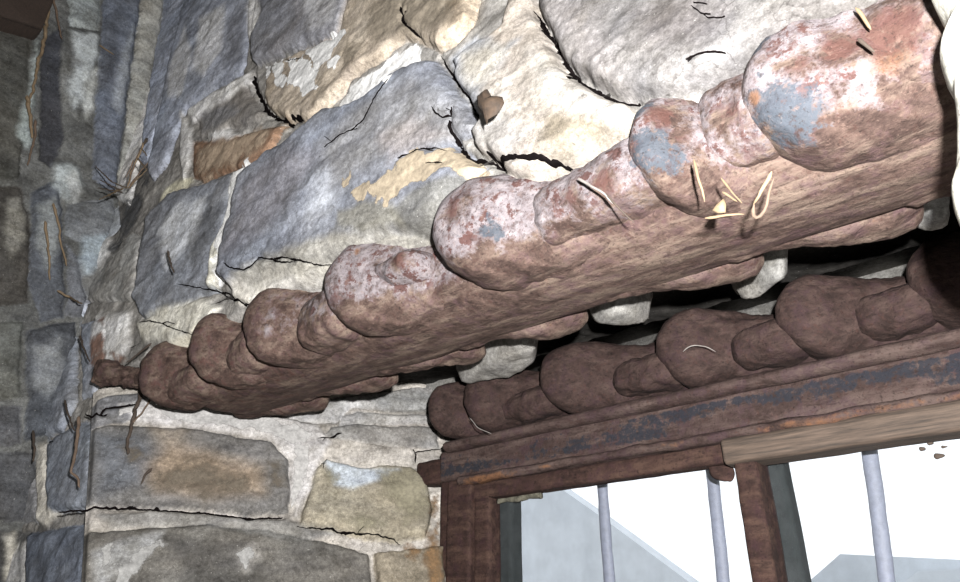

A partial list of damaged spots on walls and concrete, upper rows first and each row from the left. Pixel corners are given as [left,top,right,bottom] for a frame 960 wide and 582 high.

crack [534,12,641,107]
crack [252,76,304,128]
crack [324,79,388,147]
crack [398,56,573,172]
spalling [341,147,490,207]
crack [224,256,331,271]
crack [176,283,250,307]
rust [709,465,735,482]
crack [59,506,400,545]